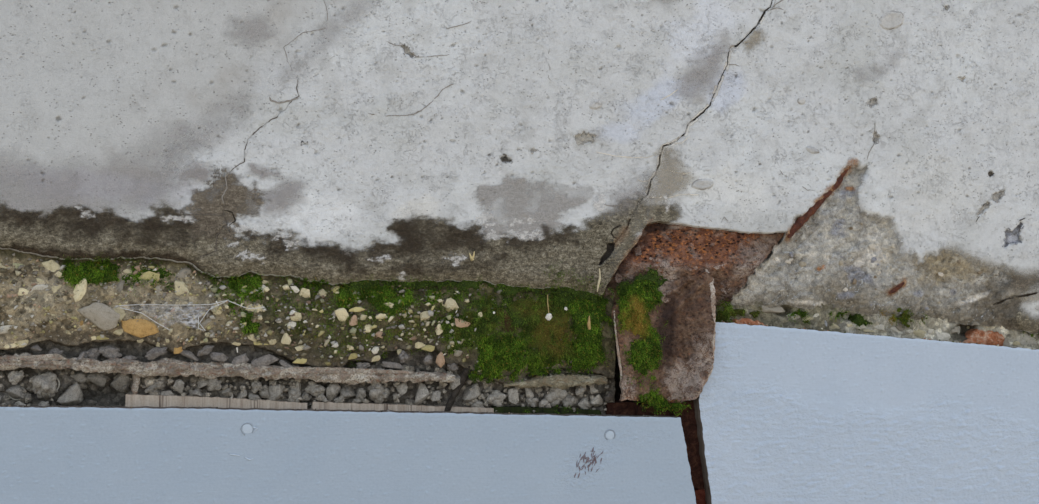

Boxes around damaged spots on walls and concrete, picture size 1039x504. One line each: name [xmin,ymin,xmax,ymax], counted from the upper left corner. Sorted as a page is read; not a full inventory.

crack [186,81,299,257]
damp [0,148,688,296]
crack [598,0,784,265]
spalling [715,165,1023,331]
damp [941,250,1039,334]